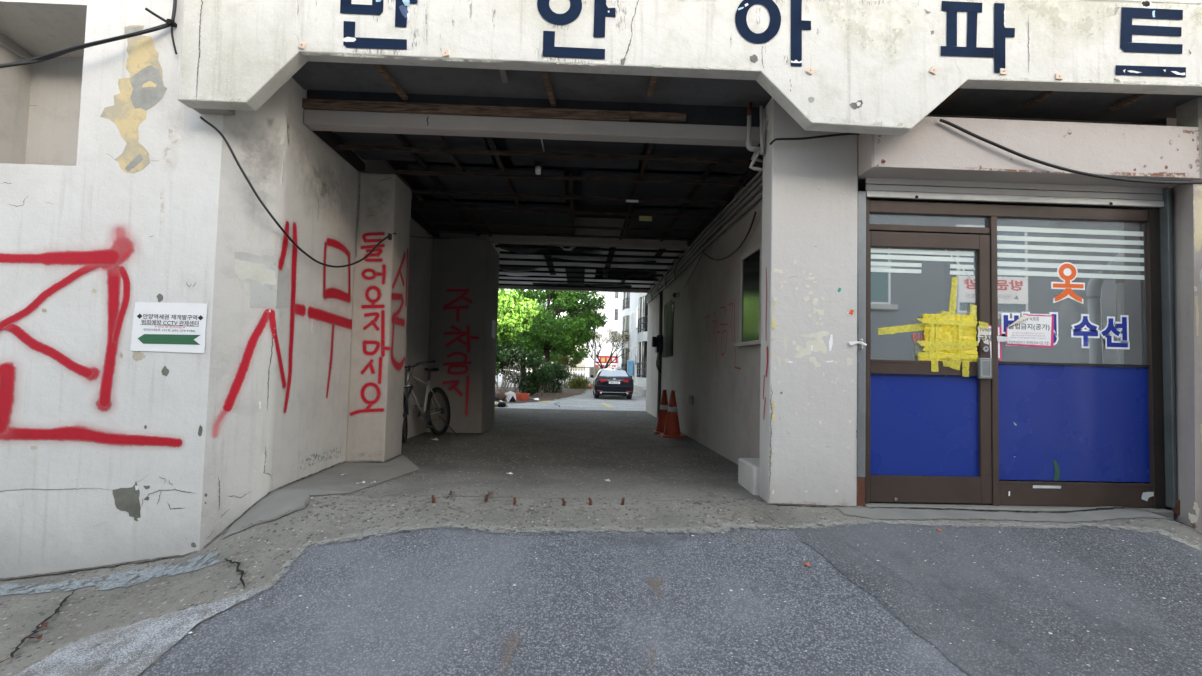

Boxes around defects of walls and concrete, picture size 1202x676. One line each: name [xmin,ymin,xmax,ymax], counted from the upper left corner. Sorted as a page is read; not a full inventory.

crack [625,0,639,57]
peeling [100,25,167,174]
peeling [772,260,854,392]
spalling [113,482,150,521]